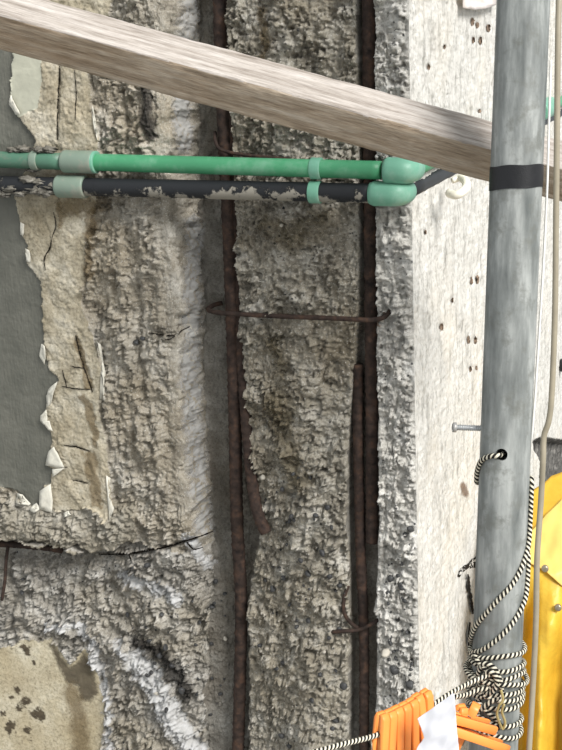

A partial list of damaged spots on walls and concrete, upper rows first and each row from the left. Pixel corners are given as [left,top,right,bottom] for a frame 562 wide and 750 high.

spalling [49,0,199,42]
rust [259,8,270,59]
spalling [213,0,410,99]
spalling [9,53,202,156]
spalling [216,108,395,162]
spalling [23,169,201,180]
crack [61,335,93,392]
spalling [0,194,420,750]
crack [100,531,213,573]
damp [0,711,32,741]
damp [9,686,45,721]
damp [44,621,115,750]